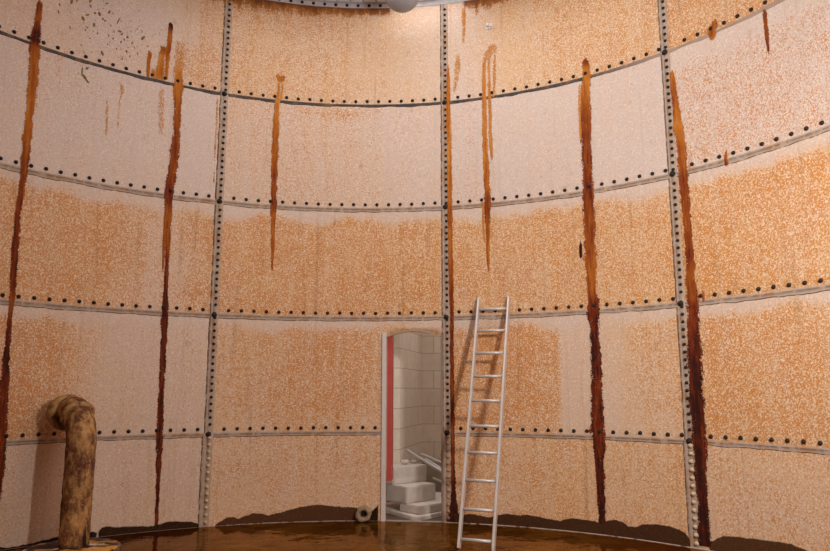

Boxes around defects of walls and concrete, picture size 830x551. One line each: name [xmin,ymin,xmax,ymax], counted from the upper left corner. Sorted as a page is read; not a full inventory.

corrosion [0,0,43,501]
corrosion [146,22,185,525]
corrosion [270,74,287,270]
corrosion [446,54,460,522]
corrosion [482,44,497,271]
corrosion [577,58,606,534]
corrosion [669,70,712,547]
corrosion [707,19,718,40]
corrosion [762,10,770,55]